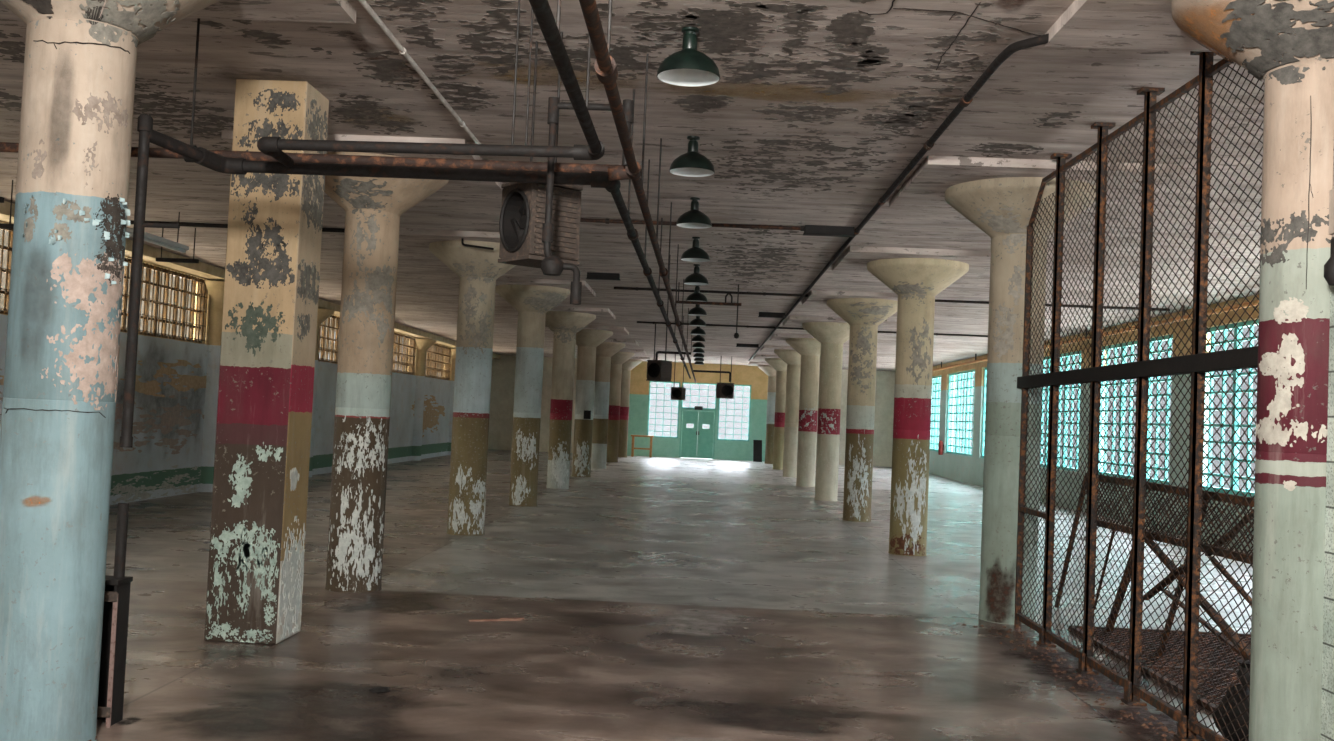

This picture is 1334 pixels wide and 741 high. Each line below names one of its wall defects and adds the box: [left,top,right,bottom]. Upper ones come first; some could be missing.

crack [859,0,1041,70]
peeling [1220,0,1334,85]
peeling [965,142,1044,157]
peeling [22,0,1010,410]
peeling [1255,297,1328,447]
peeling [206,442,306,644]
peeling [328,413,389,591]
peeling [449,464,486,534]
peeling [511,429,591,505]
peeling [847,430,871,521]
peeling [890,435,927,555]
peeling [1283,480,1297,491]